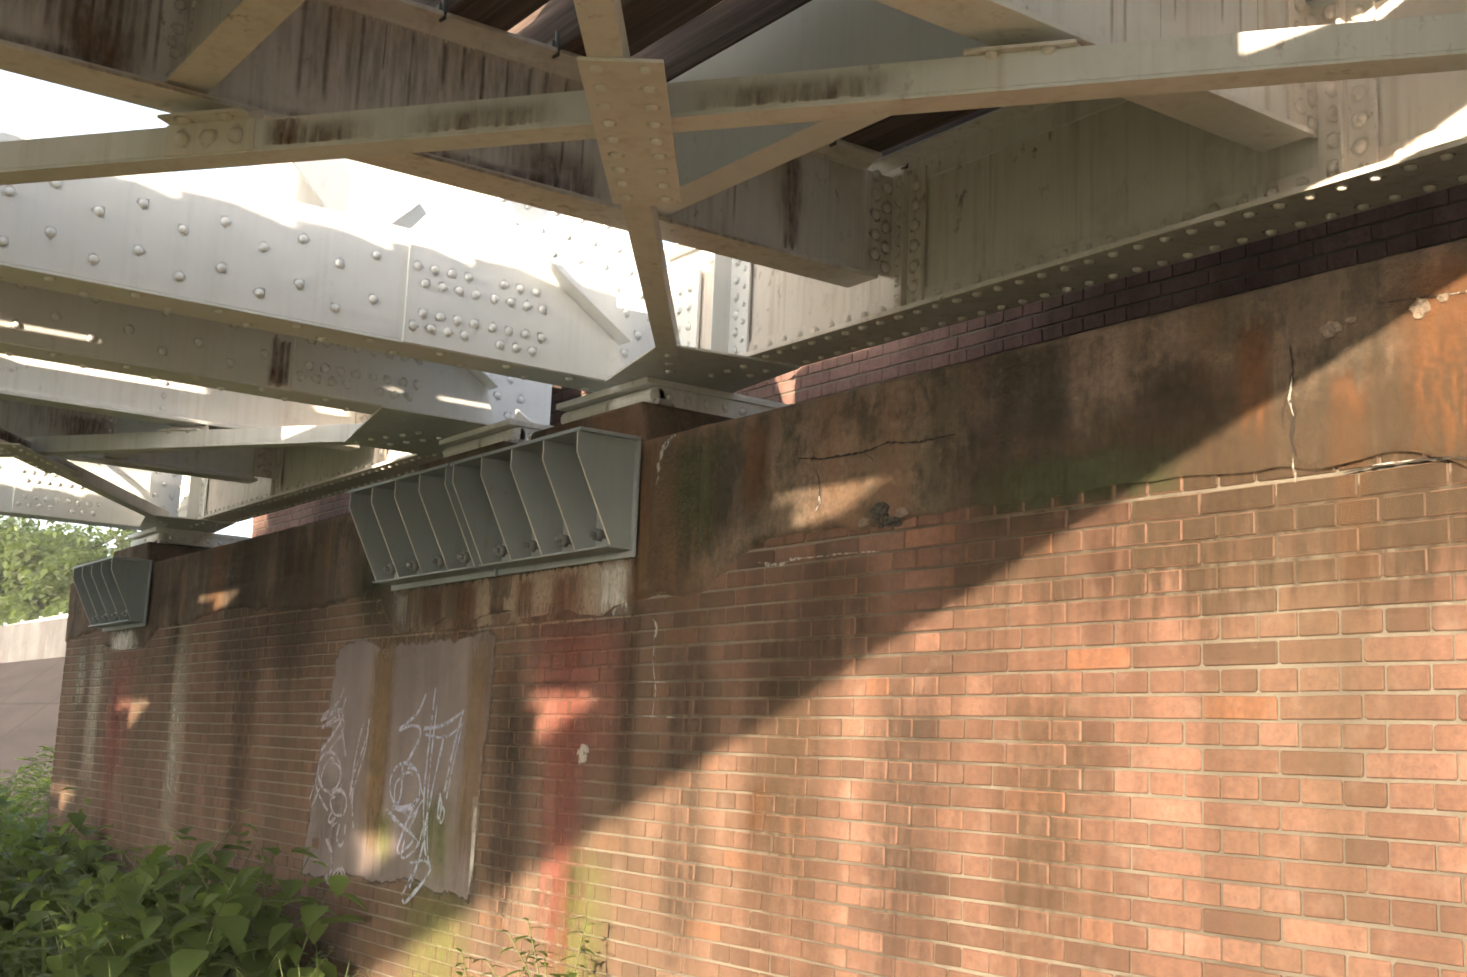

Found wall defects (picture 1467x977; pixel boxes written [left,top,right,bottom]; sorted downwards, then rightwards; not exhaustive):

spalling [857,502,910,528]
damp [971,369,1467,607]
crack [1281,345,1297,482]
damp [764,666,811,884]
damp [1015,725,1083,919]